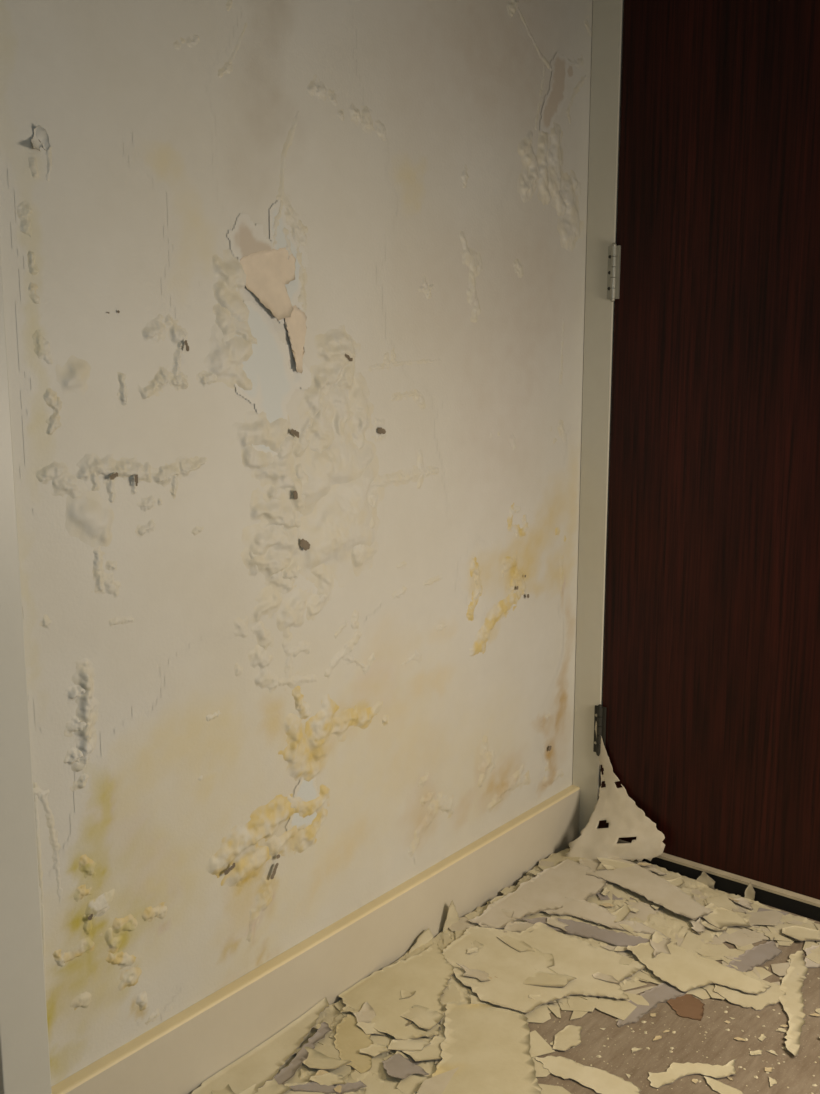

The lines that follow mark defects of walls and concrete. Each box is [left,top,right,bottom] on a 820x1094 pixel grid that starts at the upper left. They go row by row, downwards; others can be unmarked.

peeling [227,193,311,423]
water stain [39,0,585,1086]